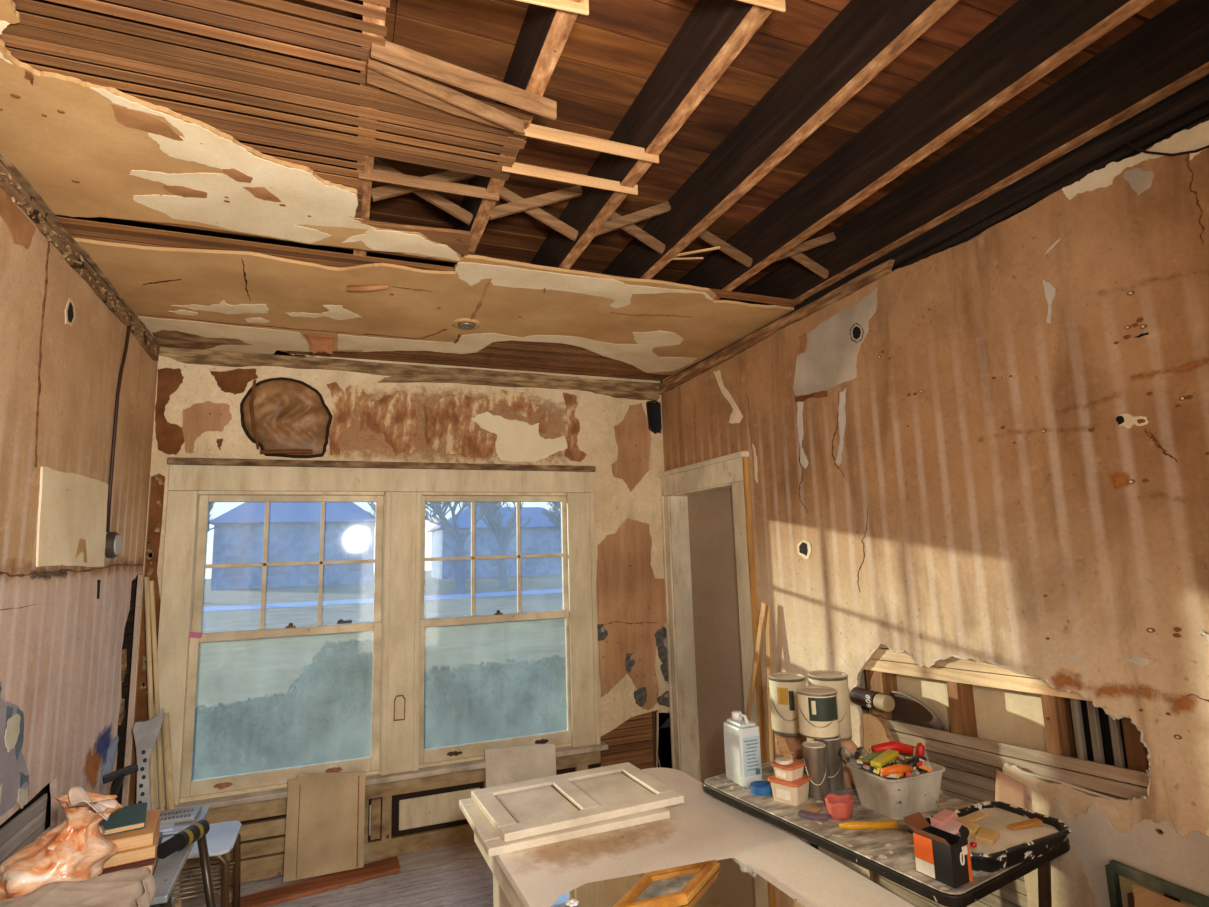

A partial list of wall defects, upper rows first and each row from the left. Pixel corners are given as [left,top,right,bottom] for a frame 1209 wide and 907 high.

peeling [1062,120,1209,200]
crack [1185,156,1205,245]
peeling [138,300,697,462]
flaking render [793,288,884,402]
spalling [1113,317,1149,344]
flaking render [611,400,662,492]
crack [0,564,143,577]
spalling [110,474,165,805]
flaking render [596,518,666,770]
spalling [855,643,1209,907]